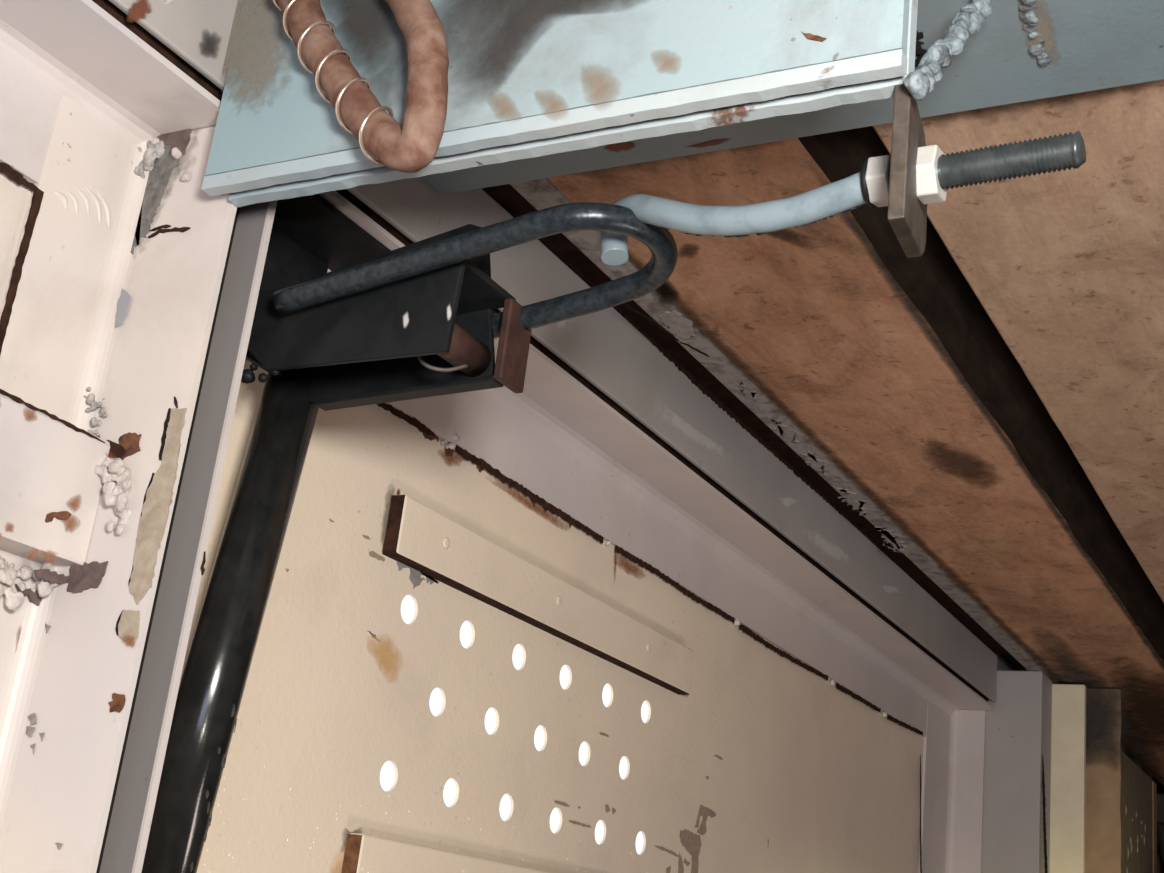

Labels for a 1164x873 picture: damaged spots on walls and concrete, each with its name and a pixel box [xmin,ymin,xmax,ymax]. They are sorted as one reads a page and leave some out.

peeling [131,129,192,254]
peeling [115,396,187,647]
rust [382,489,689,695]
rust [341,834,362,873]
spalling [655,805,716,873]